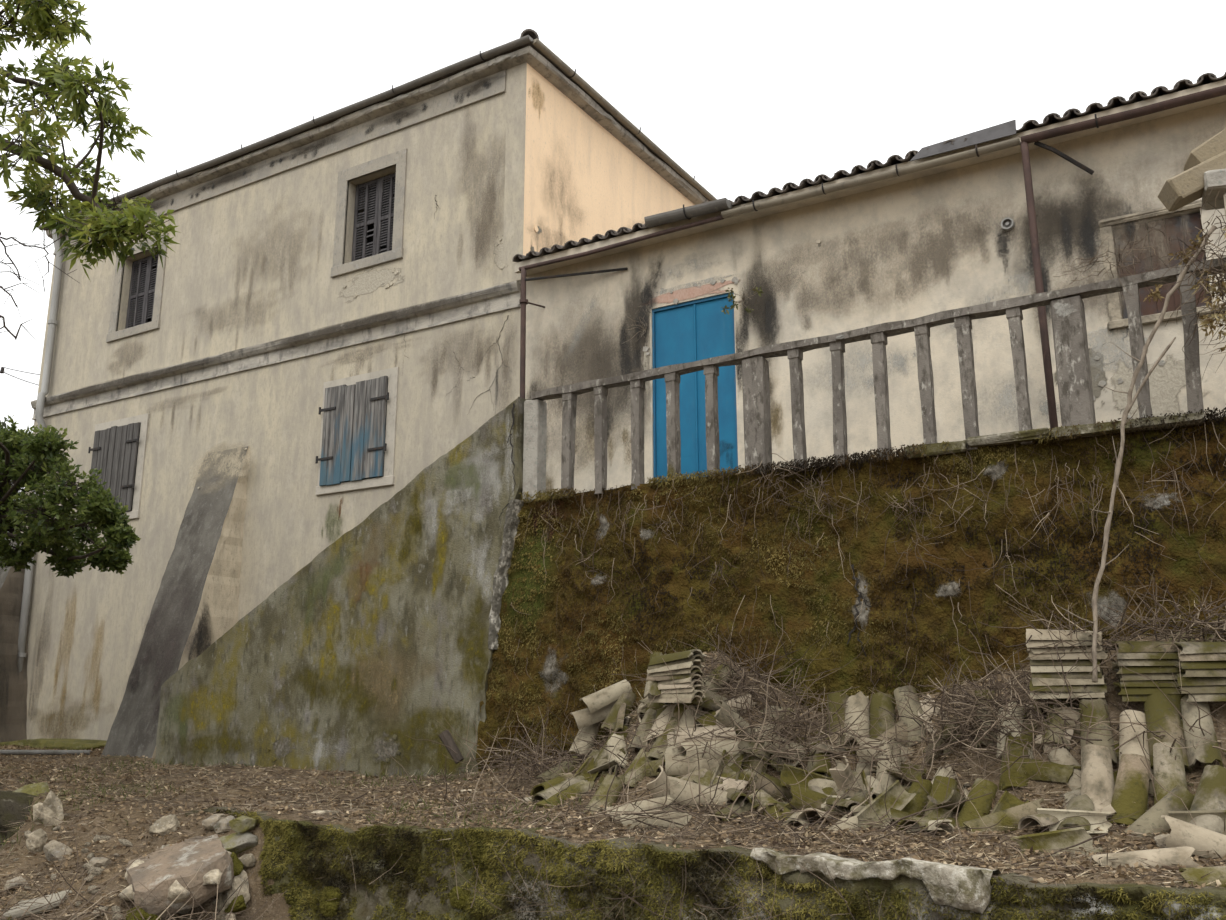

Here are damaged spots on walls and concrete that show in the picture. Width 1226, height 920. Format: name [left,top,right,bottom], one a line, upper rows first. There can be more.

spalling [340,268,404,303]
spalling [642,277,740,306]
water stain [736,266,790,384]
water stain [963,187,1166,313]